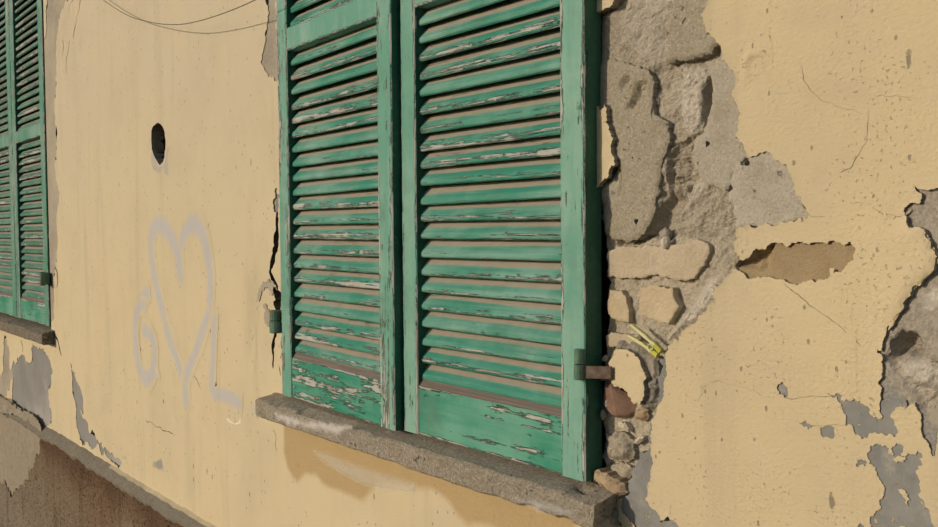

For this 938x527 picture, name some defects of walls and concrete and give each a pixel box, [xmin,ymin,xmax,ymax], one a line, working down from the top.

crack [802,70,869,172]
crack [269,211,281,310]
spalling [593,0,856,527]
spalling [906,188,938,251]
spalling [0,338,52,495]
peeling [72,371,122,465]
crack [271,333,282,376]
spalling [825,268,938,527]